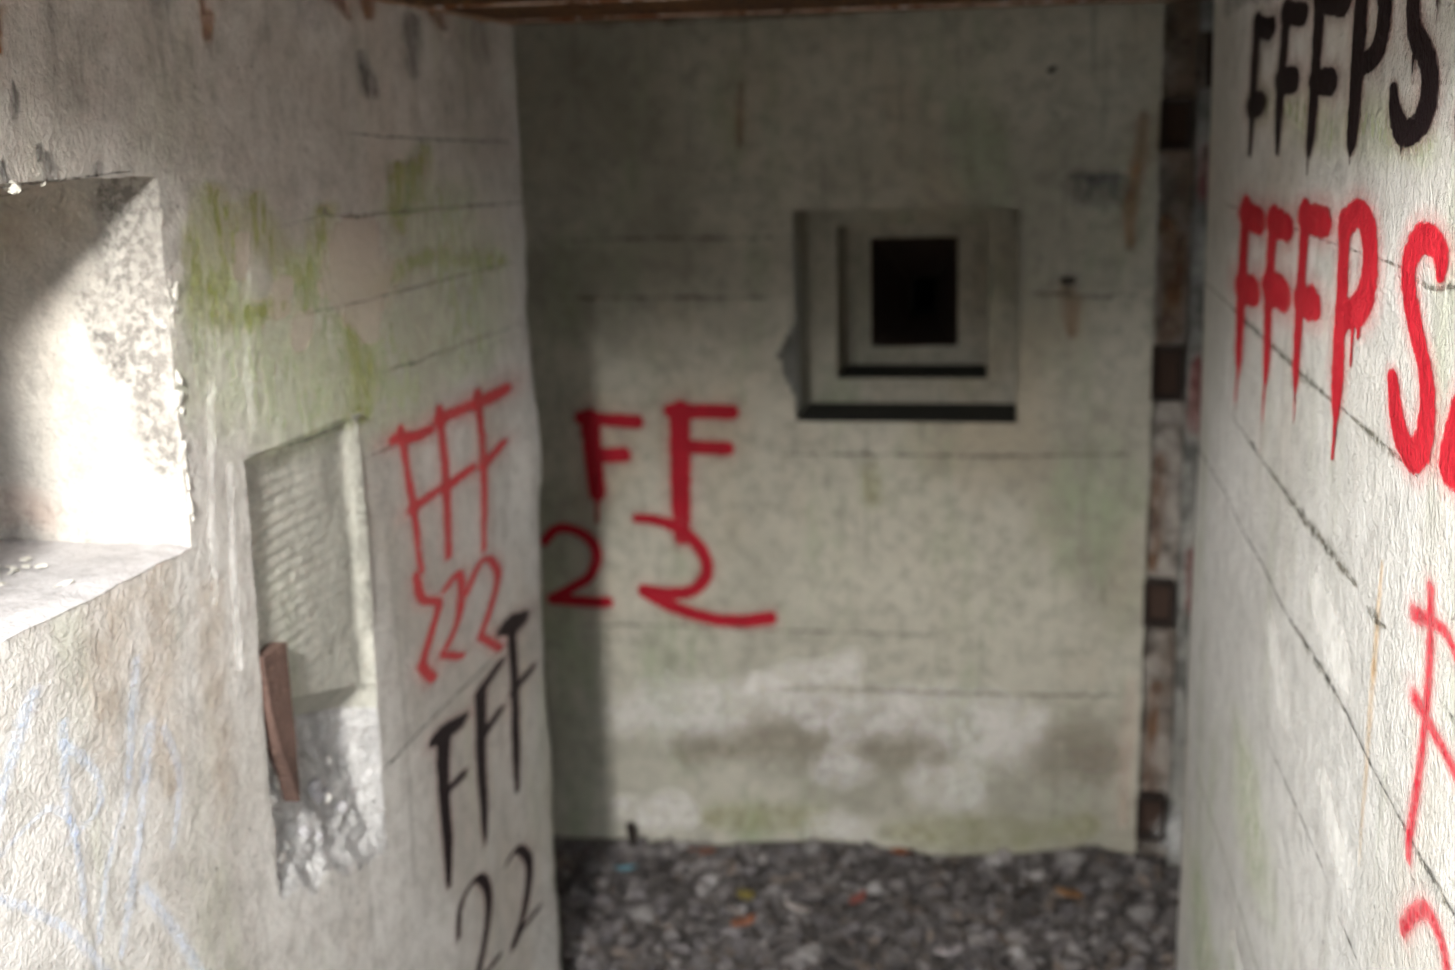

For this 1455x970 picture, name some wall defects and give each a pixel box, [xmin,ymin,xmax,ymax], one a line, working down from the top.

leakage [81,163,177,473]
leakage [187,186,329,328]
spalling [265,707,389,970]